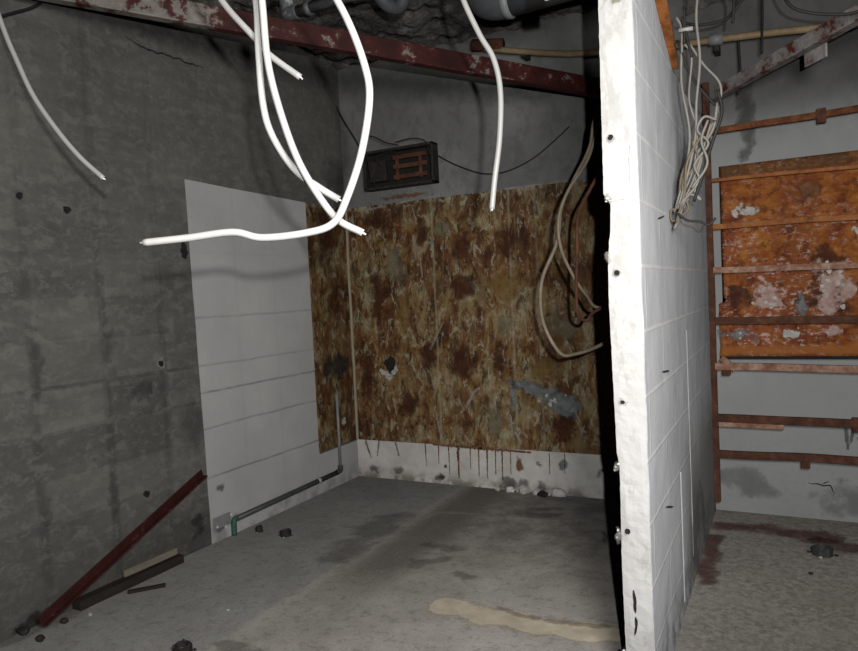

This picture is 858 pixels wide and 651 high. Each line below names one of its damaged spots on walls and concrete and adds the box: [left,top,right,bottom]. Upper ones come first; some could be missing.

rust [316,215,334,262]
rust [416,219,427,245]
rust [453,275,475,299]
rust [728,286,753,308]
rust [795,246,850,314]
rust [425,444,531,479]